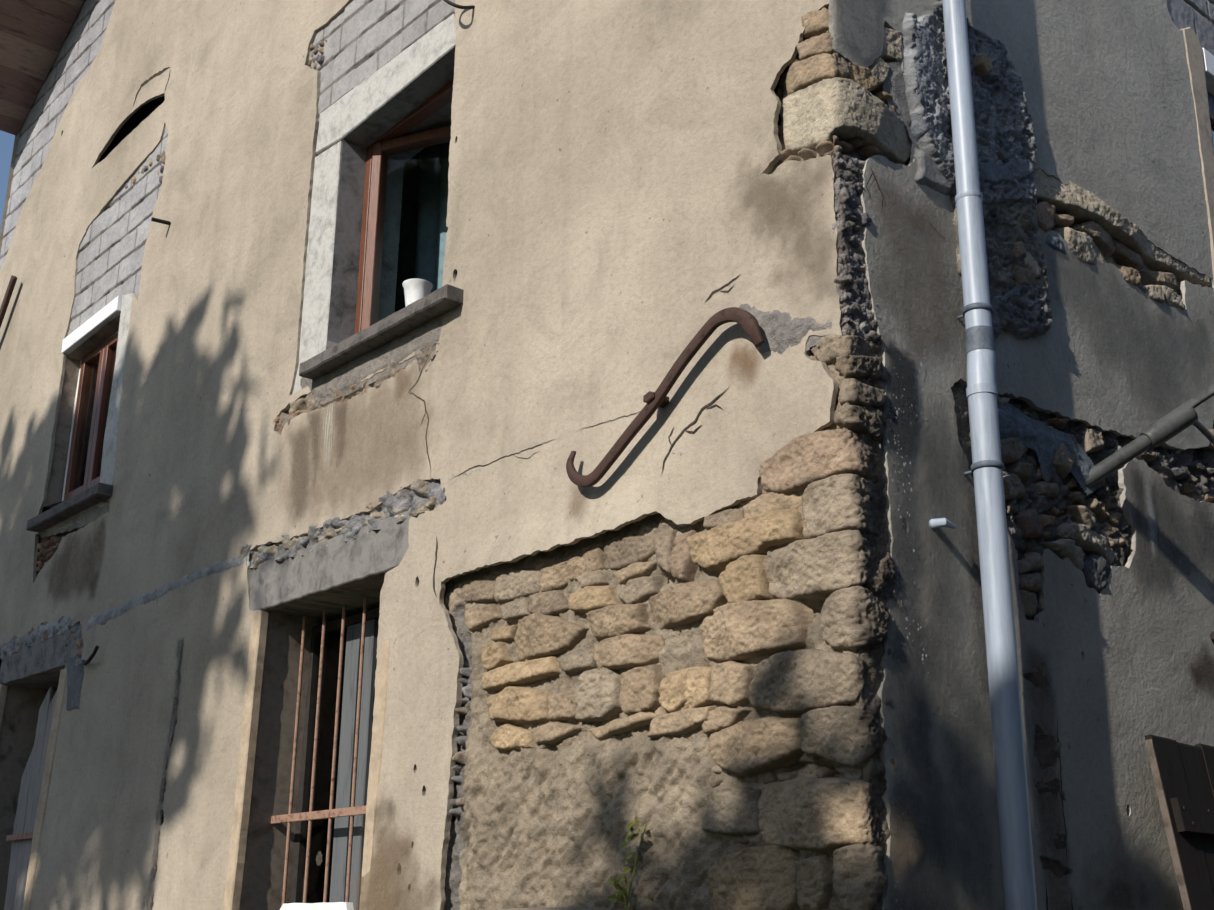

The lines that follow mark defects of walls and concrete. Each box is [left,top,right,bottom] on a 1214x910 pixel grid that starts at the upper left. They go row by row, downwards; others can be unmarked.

crack [133,67,171,106]
crack [704,275,739,303]
spalling [832,153,880,341]
flaking render [1034,168,1211,310]
spalling [273,316,443,434]
crack [660,385,730,476]
water stain [888,341,918,452]
spalling [240,479,446,569]
water stain [1133,471,1214,584]
spalling [0,616,84,711]